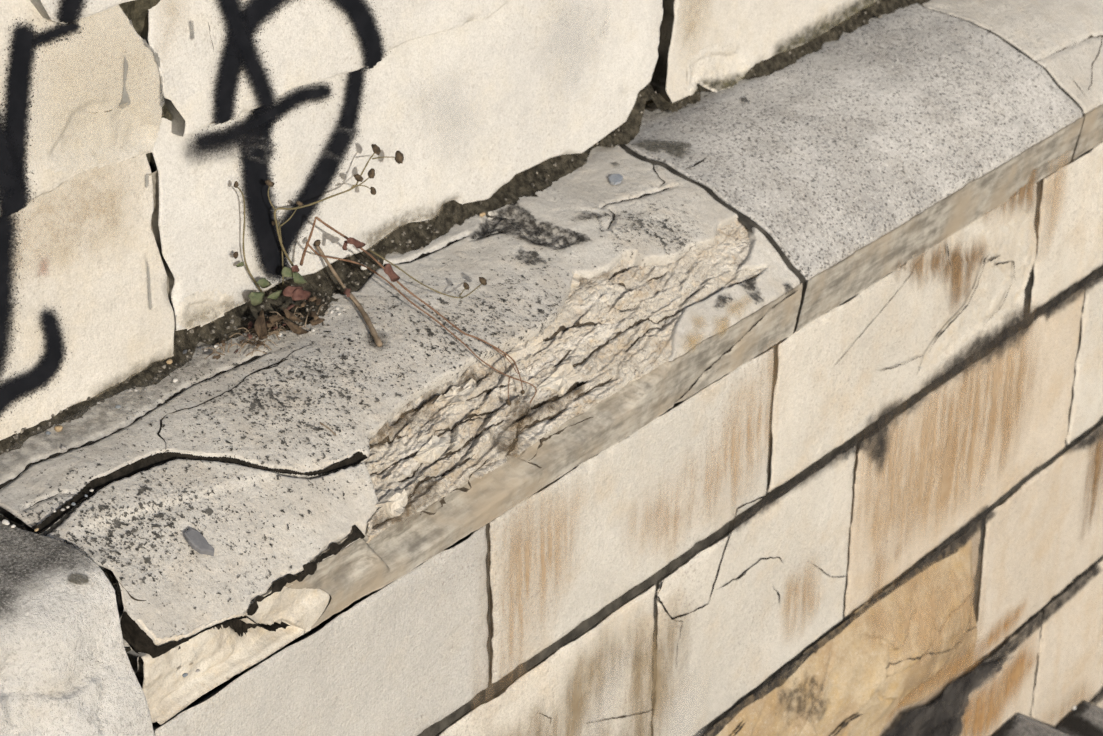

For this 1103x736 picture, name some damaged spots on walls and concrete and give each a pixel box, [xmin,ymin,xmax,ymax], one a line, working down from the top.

crack [1041,35,1103,95]
spalling [349,220,766,543]
crack [679,291,796,400]
crack [0,266,760,725]
crack [657,492,782,665]